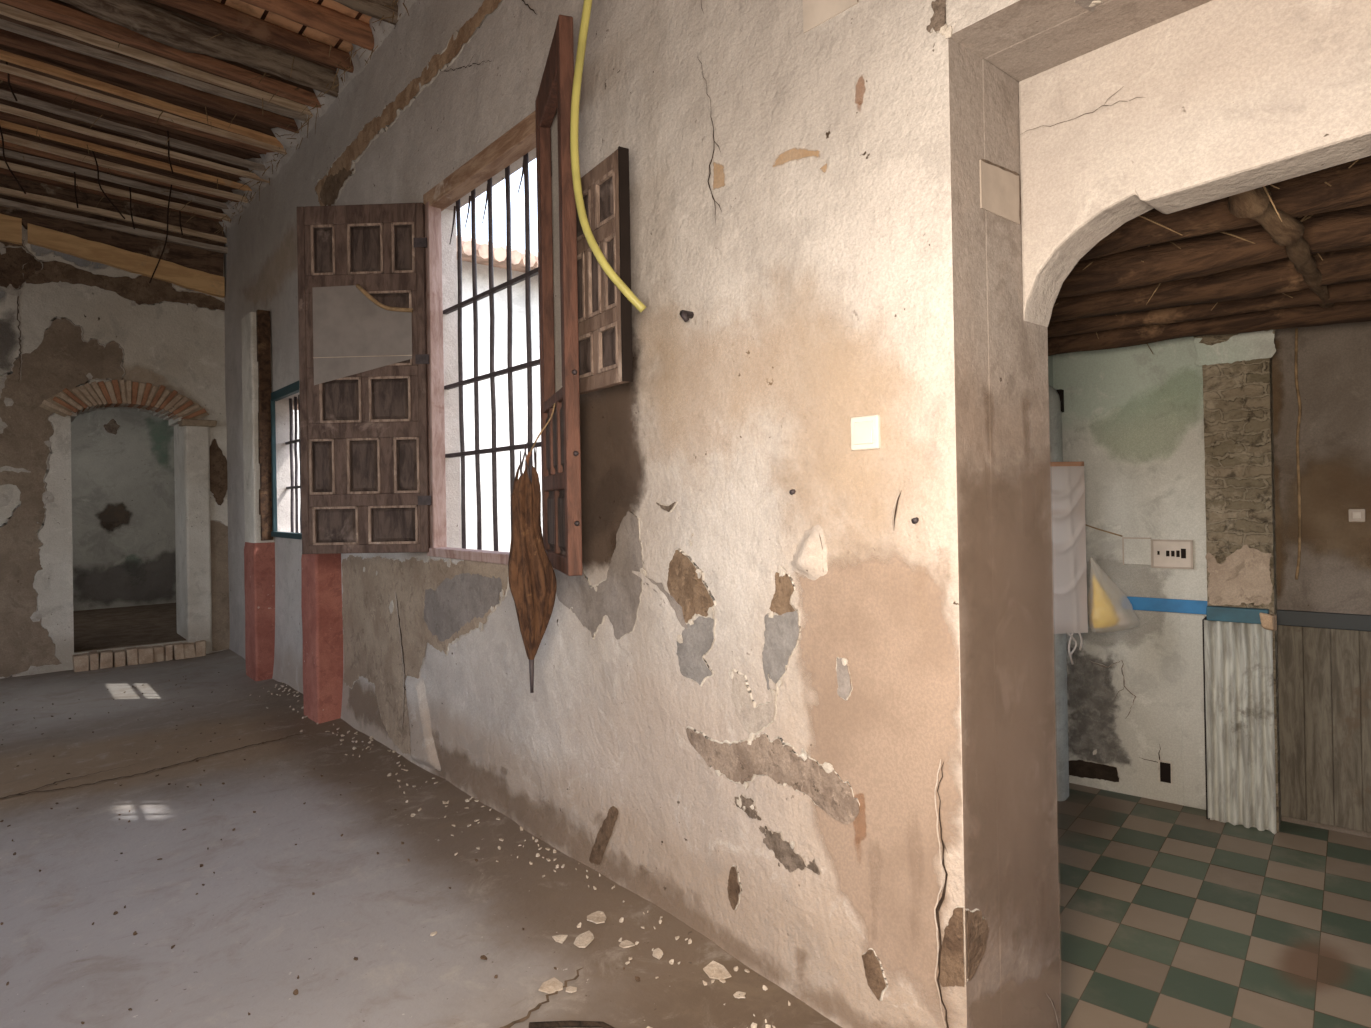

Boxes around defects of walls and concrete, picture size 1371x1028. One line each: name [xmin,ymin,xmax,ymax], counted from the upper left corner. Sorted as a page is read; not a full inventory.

flaking render [926,0,952,39]
crack [696,53,722,224]
peeling [0,240,225,312]
peeling [0,316,126,679]
peeling [209,438,230,652]
peeling [342,554,509,756]
peeling [632,533,860,875]
crack [500,968,582,1028]
flaking render [727,865,743,910]
flaking render [862,948,888,1001]
crack [934,759,949,1028]
flaking render [939,906,989,987]